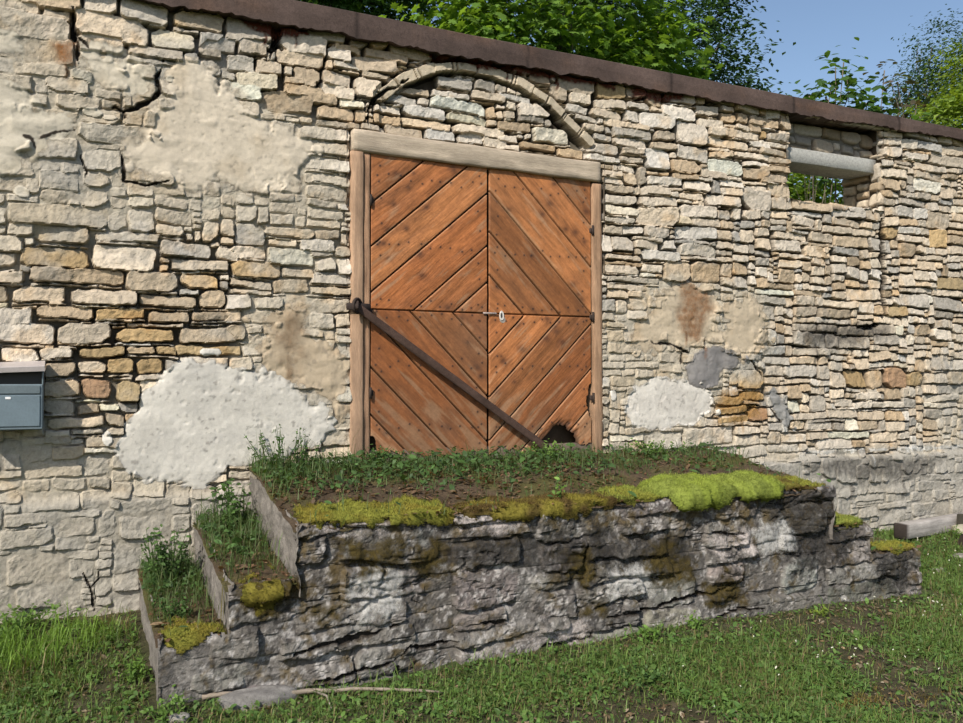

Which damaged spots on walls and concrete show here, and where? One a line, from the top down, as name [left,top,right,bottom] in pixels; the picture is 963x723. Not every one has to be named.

crack [71,7,89,61]
crack [112,60,164,118]
crack [23,129,71,148]
crack [121,155,169,187]